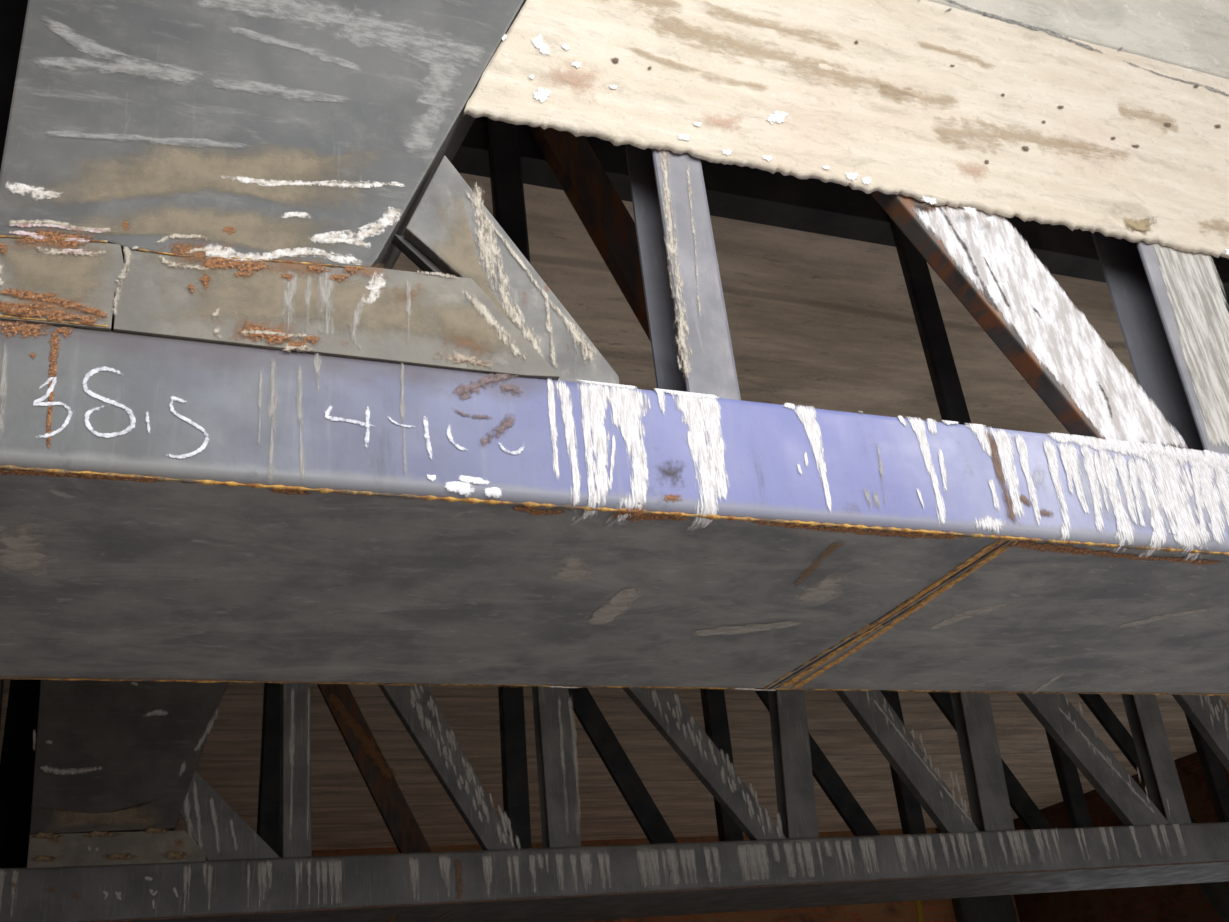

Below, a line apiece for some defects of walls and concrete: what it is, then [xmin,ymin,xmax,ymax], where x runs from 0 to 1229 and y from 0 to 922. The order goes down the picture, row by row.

corrosion [161,243,267,293]
corrosion [0,288,108,448]
leakage [0,149,728,528]
corrosion [434,308,520,446]
leakage [898,205,1229,561]
leakage [784,403,832,512]
corrosion [987,432,1052,523]
corrosion [753,521,962,582]
corrosion [781,537,1220,689]
leakage [652,690,878,880]
leakage [409,858,419,899]
leakage [637,847,720,886]